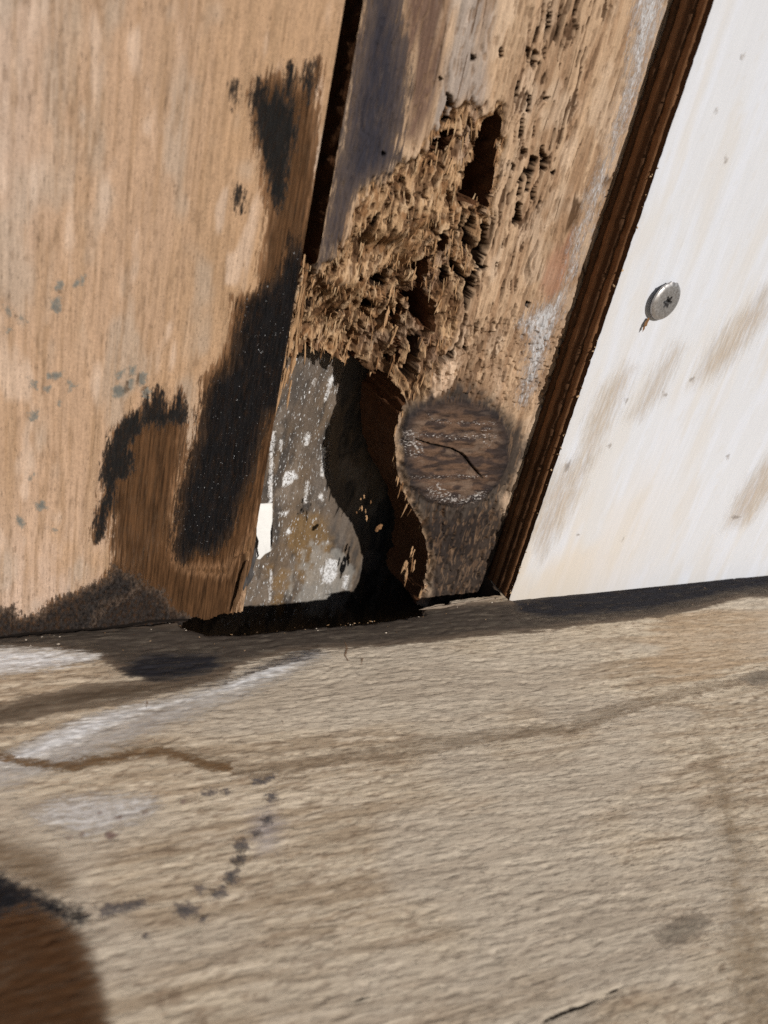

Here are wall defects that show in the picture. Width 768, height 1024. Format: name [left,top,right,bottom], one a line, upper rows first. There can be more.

spalling [299,0,363,278]
spalling [428,128,456,153]
spalling [456,110,502,207]
leakage [0,0,768,786]
spalling [324,233,449,606]
crack [415,438,479,475]